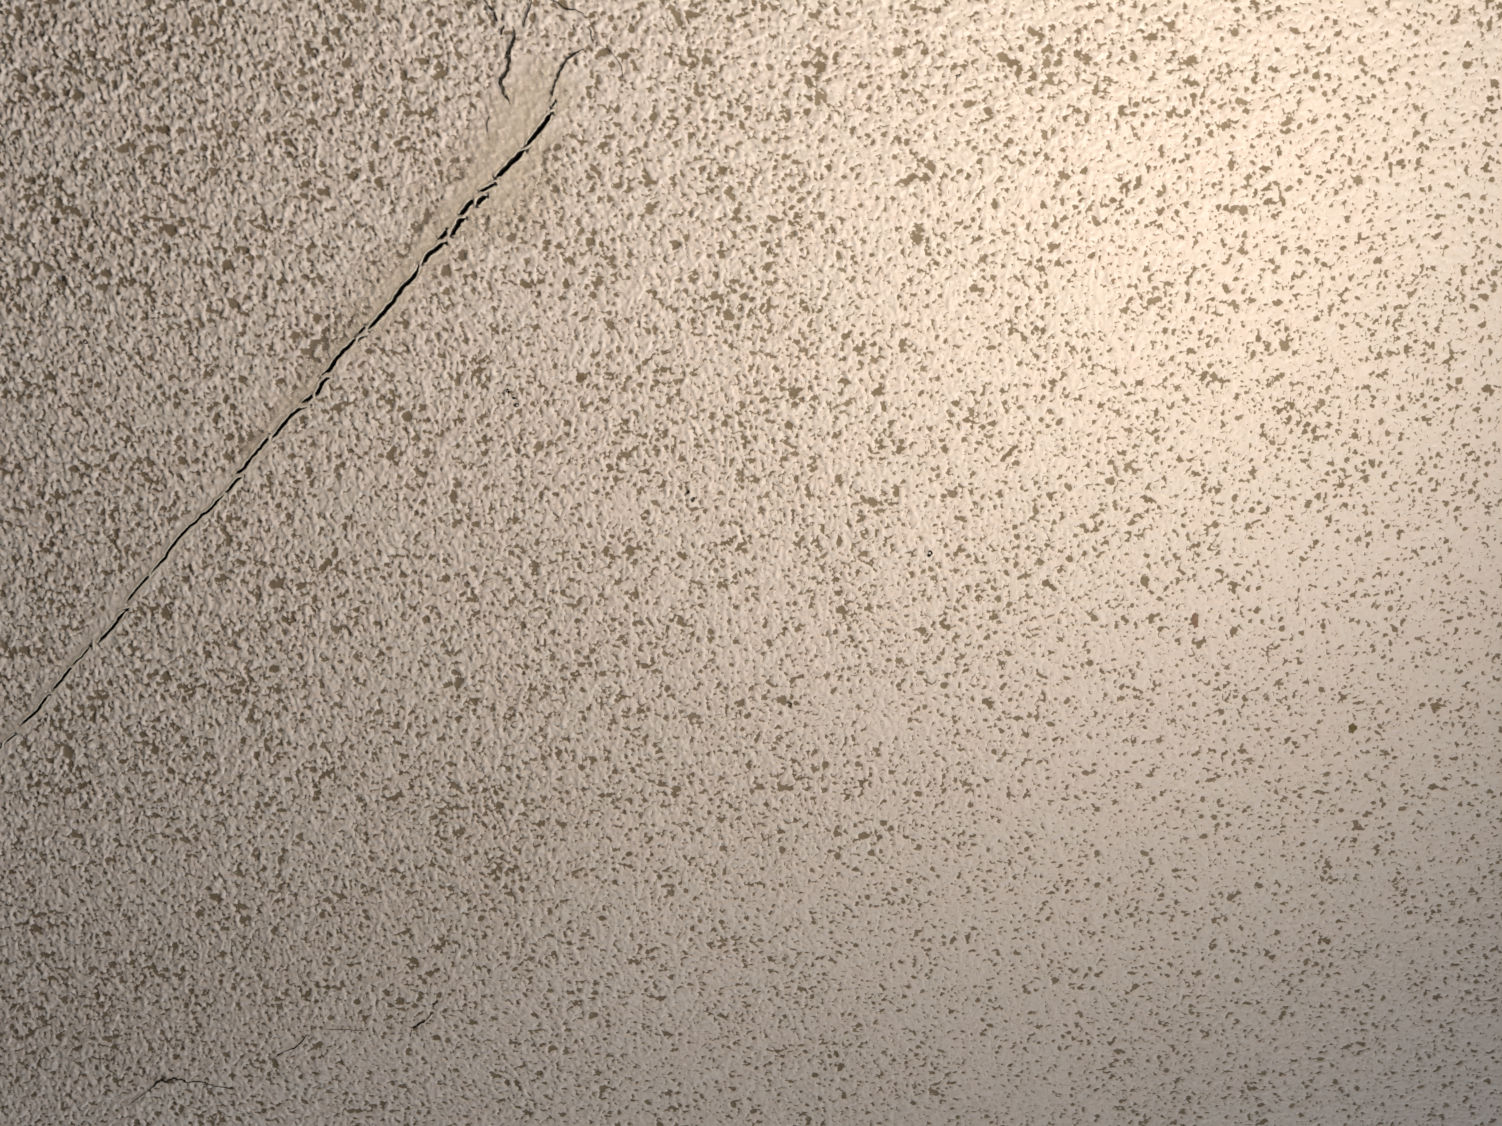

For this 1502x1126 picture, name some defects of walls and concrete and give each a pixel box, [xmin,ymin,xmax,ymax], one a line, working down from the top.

crack [0,0,624,753]